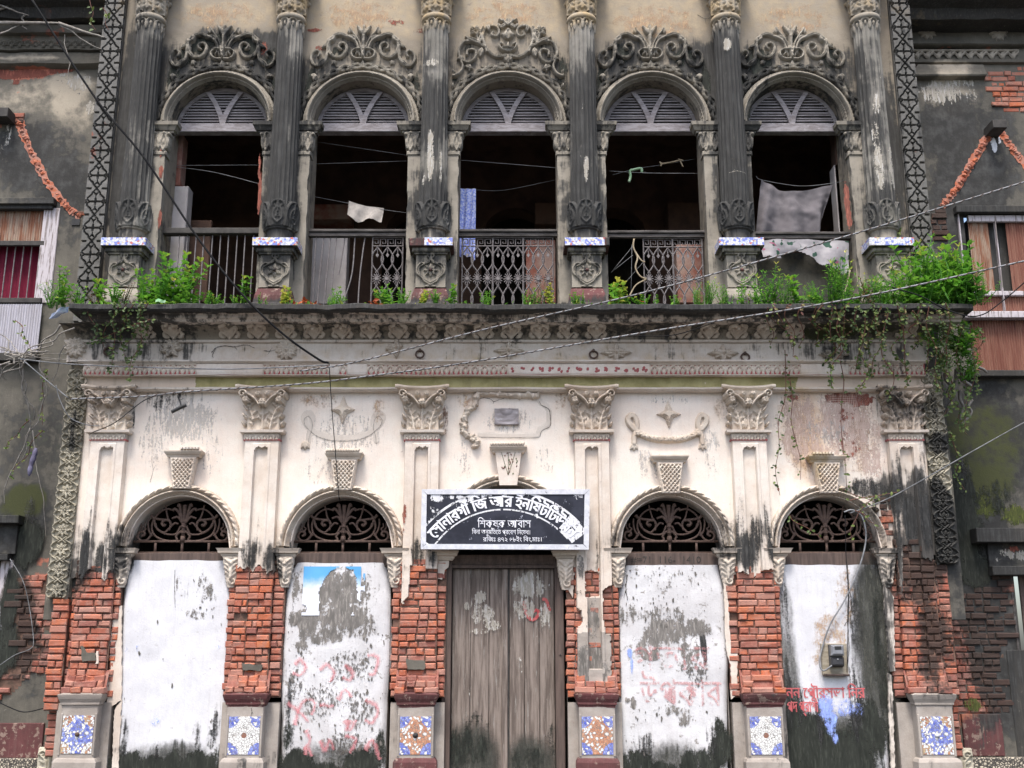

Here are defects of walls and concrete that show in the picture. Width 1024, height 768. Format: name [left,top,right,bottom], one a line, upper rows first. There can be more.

flaking render [918,67,1024,112]
flaking render [0,560,125,768]
flaking render [185,559,449,756]
peeling [512,569,550,626]
flaking render [565,566,786,727]
leakage [844,421,933,559]
flaking render [878,497,1019,768]
leakage [952,453,1012,590]
peeling [996,546,1024,562]
leakage [107,711,220,768]